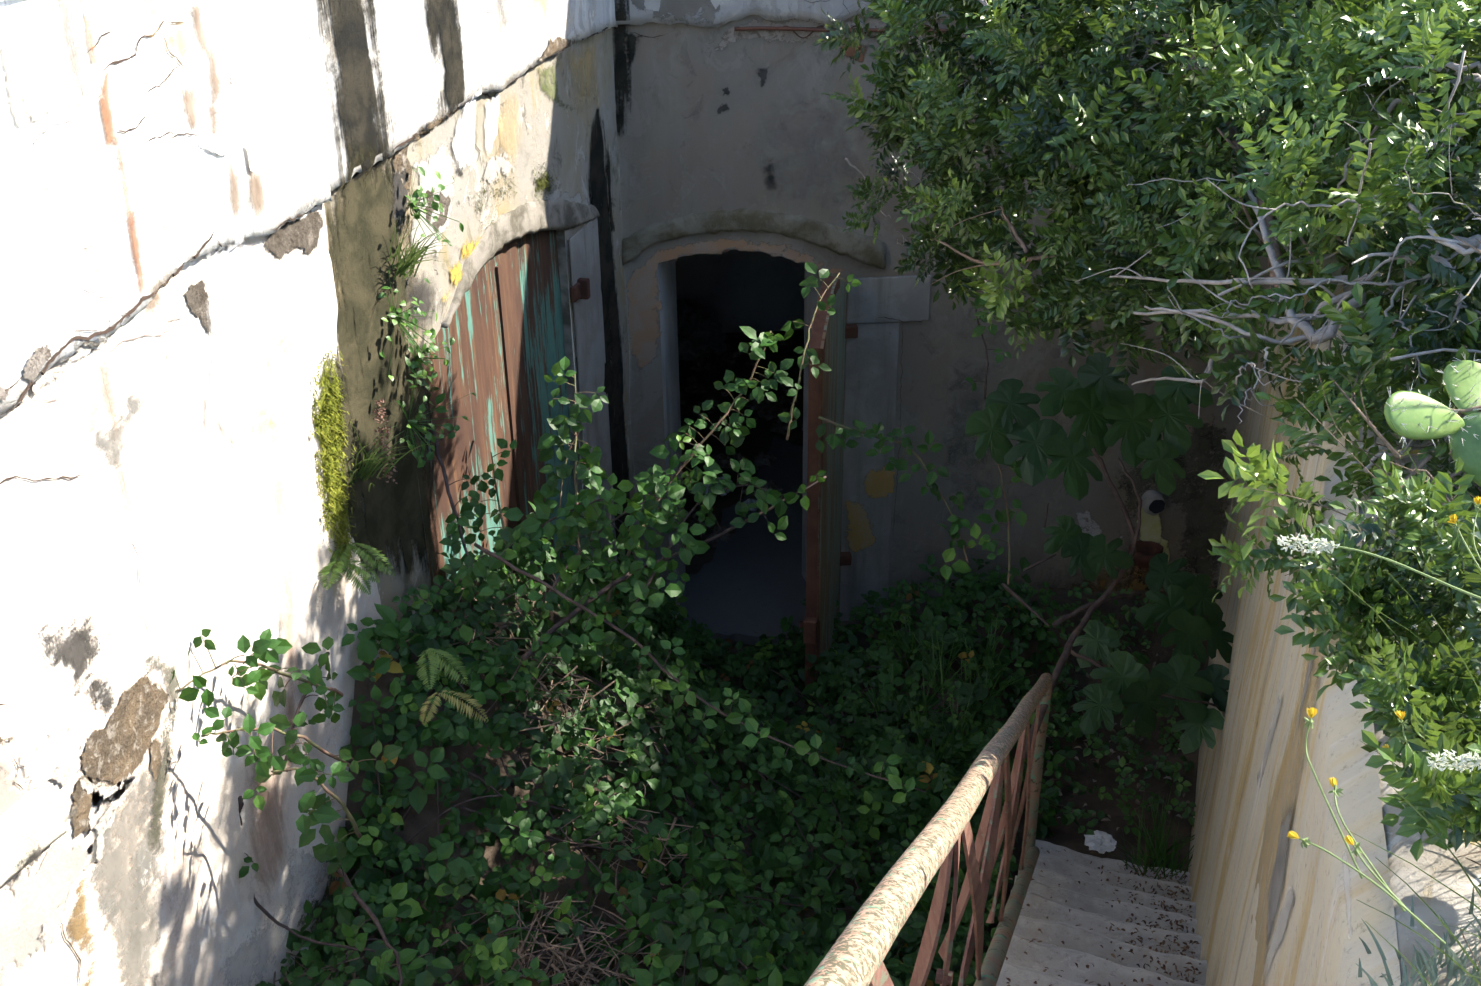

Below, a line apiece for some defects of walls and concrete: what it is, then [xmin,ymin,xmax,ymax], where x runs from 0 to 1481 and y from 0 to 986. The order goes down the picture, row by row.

rust [83,0,144,291]
crack [5,229,222,411]
crack [86,5,202,170]
flaking render [184,280,215,338]
flaking render [264,208,323,259]
leakage [318,0,440,576]
peeling [393,113,457,257]
leakage [425,0,517,177]
leakage [573,0,642,564]
crack [0,475,87,484]
mould [33,612,115,717]
flaking render [0,665,169,986]